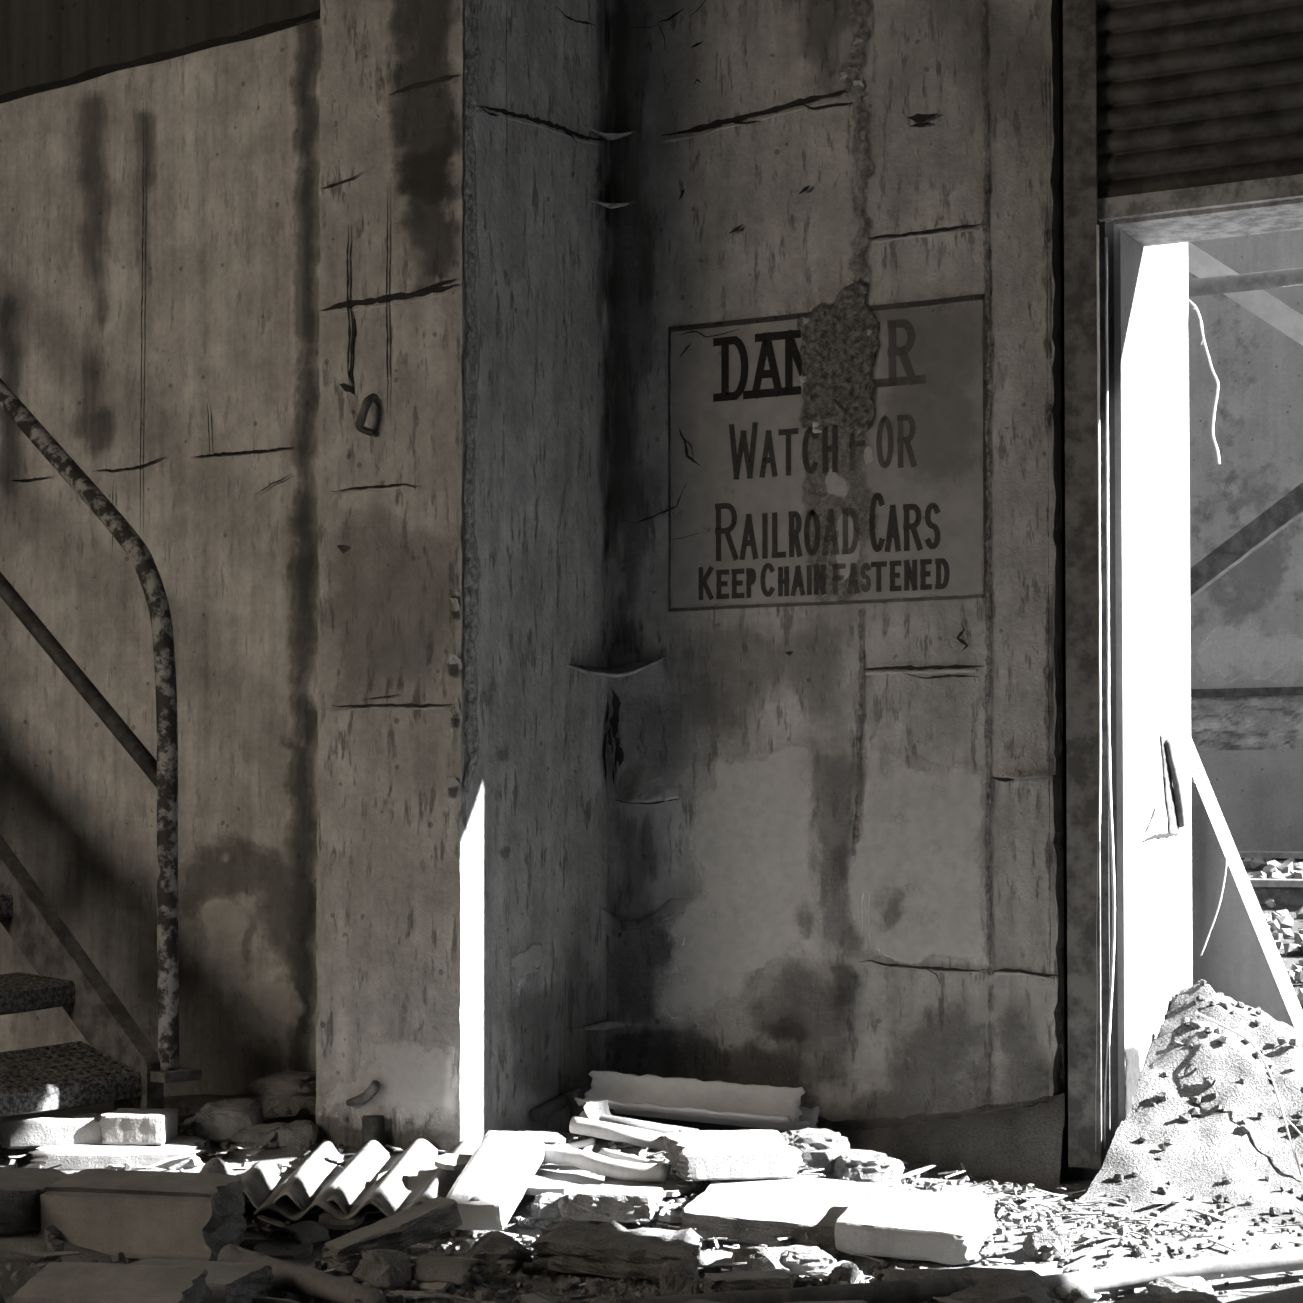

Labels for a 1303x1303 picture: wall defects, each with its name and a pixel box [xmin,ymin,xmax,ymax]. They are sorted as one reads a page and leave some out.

crack [556,6,596,26]
crack [474,10,608,145]
crack [661,90,852,143]
damp [596,0,652,600]
damp [609,747,856,1108]
damp [627,1115,785,1133]
damp [852,1011,1048,1130]